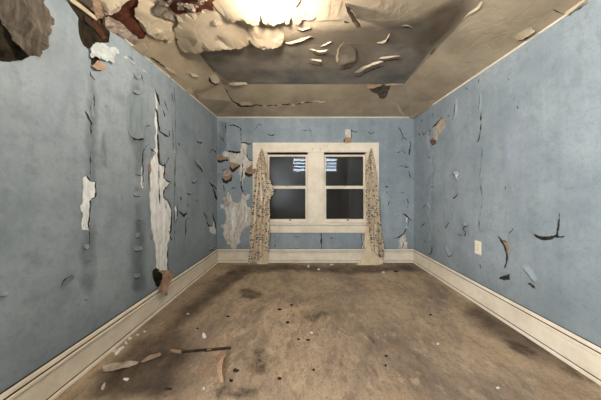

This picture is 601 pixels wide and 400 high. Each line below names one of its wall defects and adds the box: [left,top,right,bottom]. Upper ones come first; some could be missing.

peeling [0,0,55,62]
peeling [67,0,135,71]
peeling [285,17,338,46]
peeling [308,42,331,66]
peeling [354,55,400,77]
crack [225,89,341,117]
peeling [430,99,458,145]
flaking render [80,175,97,249]
flaking render [146,90,198,296]
flaking render [204,124,256,249]
peeling [495,219,513,280]